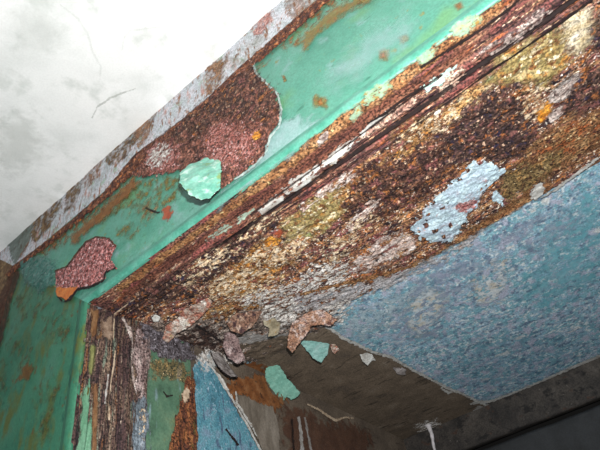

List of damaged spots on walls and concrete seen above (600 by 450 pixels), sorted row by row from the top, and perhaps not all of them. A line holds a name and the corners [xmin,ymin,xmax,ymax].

peeling [54,236,117,302]
rust [0,114,185,351]
peeling [104,351,116,420]
rust [169,375,199,450]
rust [90,0,600,340]
peeling [113,65,600,450]
crack [215,0,593,248]